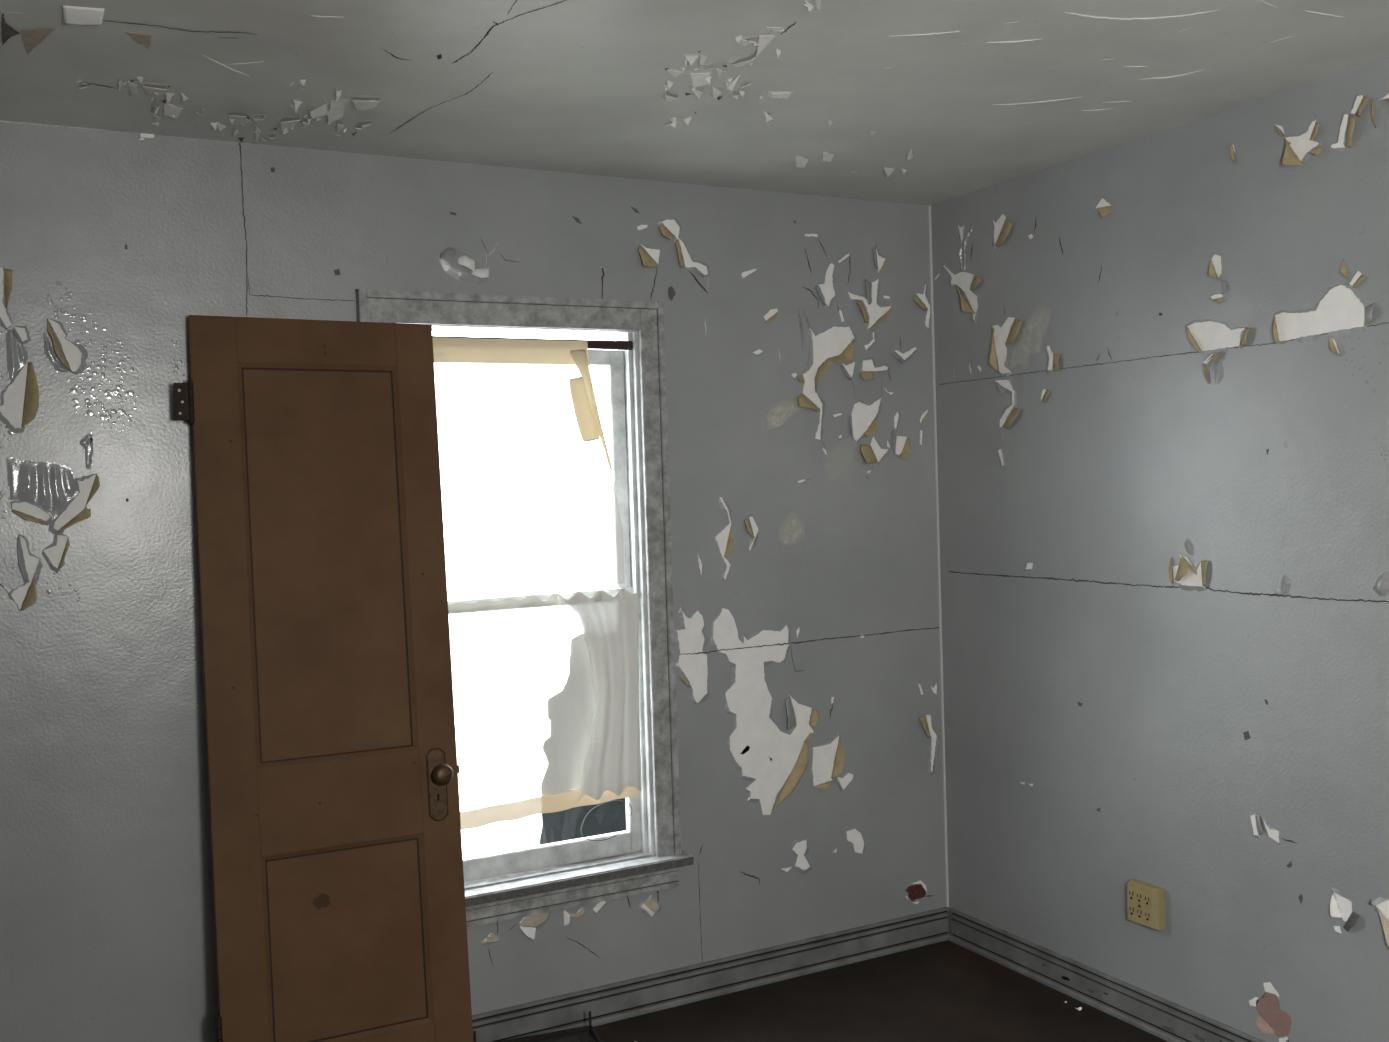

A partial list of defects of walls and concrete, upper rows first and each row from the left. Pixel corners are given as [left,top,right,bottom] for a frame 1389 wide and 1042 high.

crack [383,0,566,133]
peeling [1275,93,1389,165]
peeling [0,362,39,433]
peeling [630,206,710,293]
peeling [751,242,931,480]
peeling [941,223,1022,468]
peeling [1184,253,1251,385]
peeling [1273,258,1375,356]
peeling [0,473,100,612]
crack [948,571,1389,603]
peeling [674,607,855,816]
peeling [1330,887,1389,947]